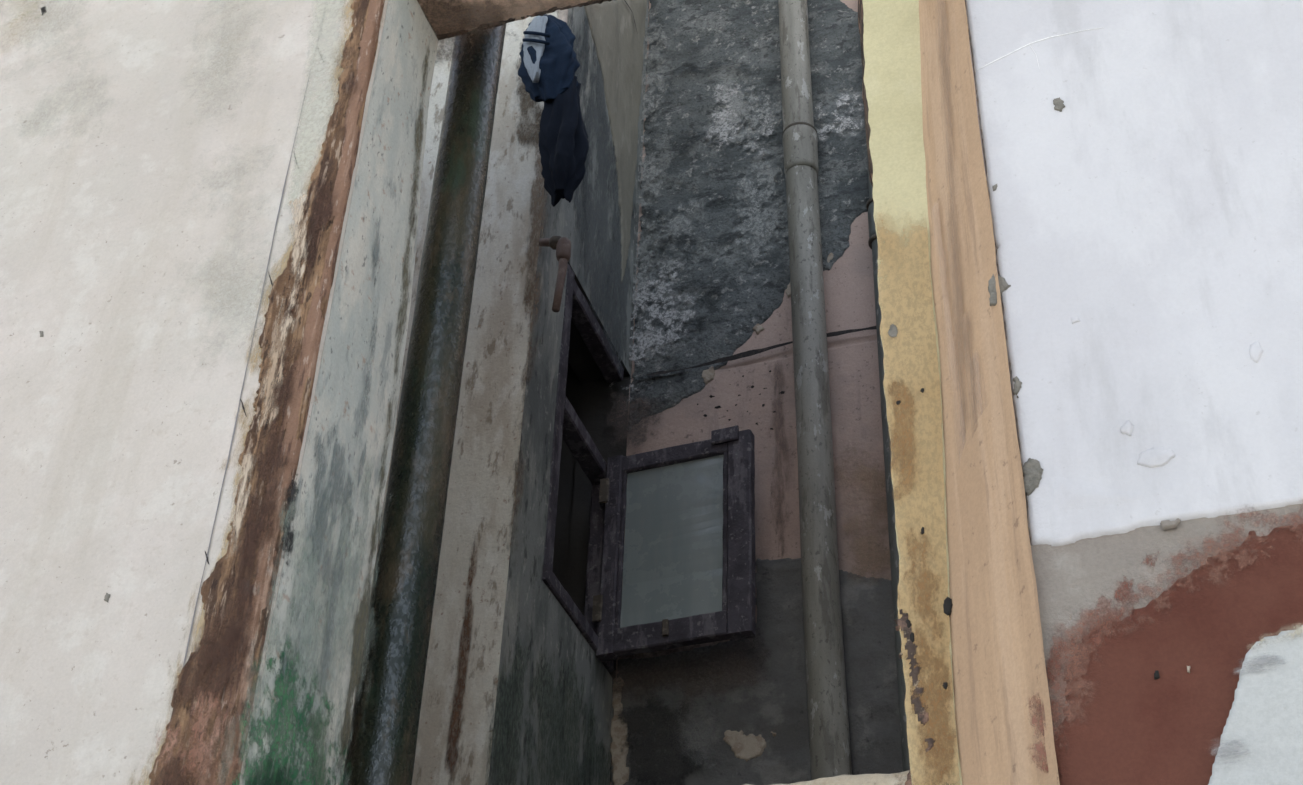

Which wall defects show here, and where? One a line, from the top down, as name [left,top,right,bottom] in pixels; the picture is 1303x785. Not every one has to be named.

corrosion [331,0,354,100]
spalling [439,0,791,433]
spalling [807,0,869,271]
corrosion [445,546,475,773]
spalling [610,558,811,785]
spalling [839,570,935,785]
peeling [1028,505,1303,785]